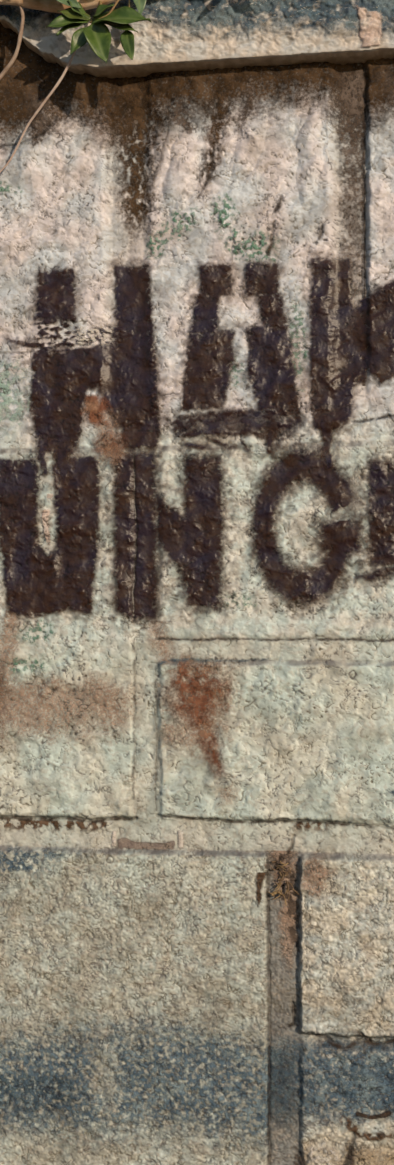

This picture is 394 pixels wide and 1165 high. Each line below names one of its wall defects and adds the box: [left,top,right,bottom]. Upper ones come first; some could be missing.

leakage [0,22,394,298]
rust [85,395,122,460]
rust [152,623,233,773]